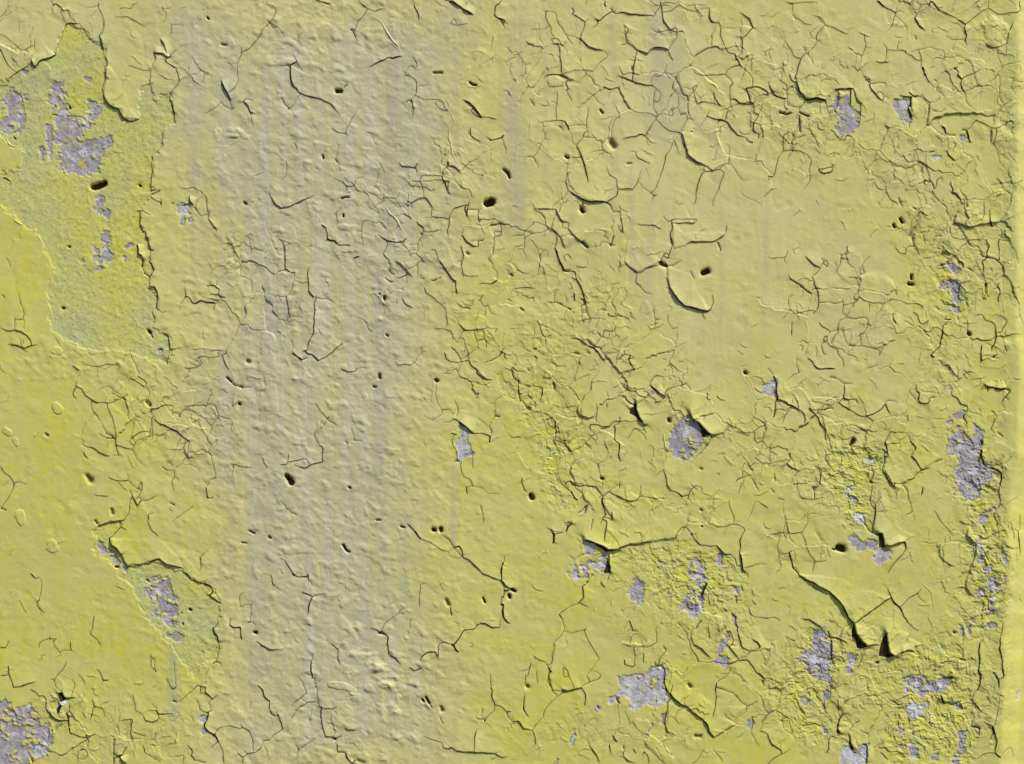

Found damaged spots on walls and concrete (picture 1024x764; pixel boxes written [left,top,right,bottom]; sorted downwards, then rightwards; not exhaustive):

crack [0,1,173,122]
peeling [0,24,177,365]
crack [128,0,1021,547]
spalling [0,689,76,764]
peeling [92,521,222,678]
crack [0,352,365,764]
crack [370,524,513,671]
crack [426,573,611,758]
spalling [607,663,669,739]
peeling [567,534,747,667]
crack [622,247,1021,764]
peeling [767,410,1014,764]